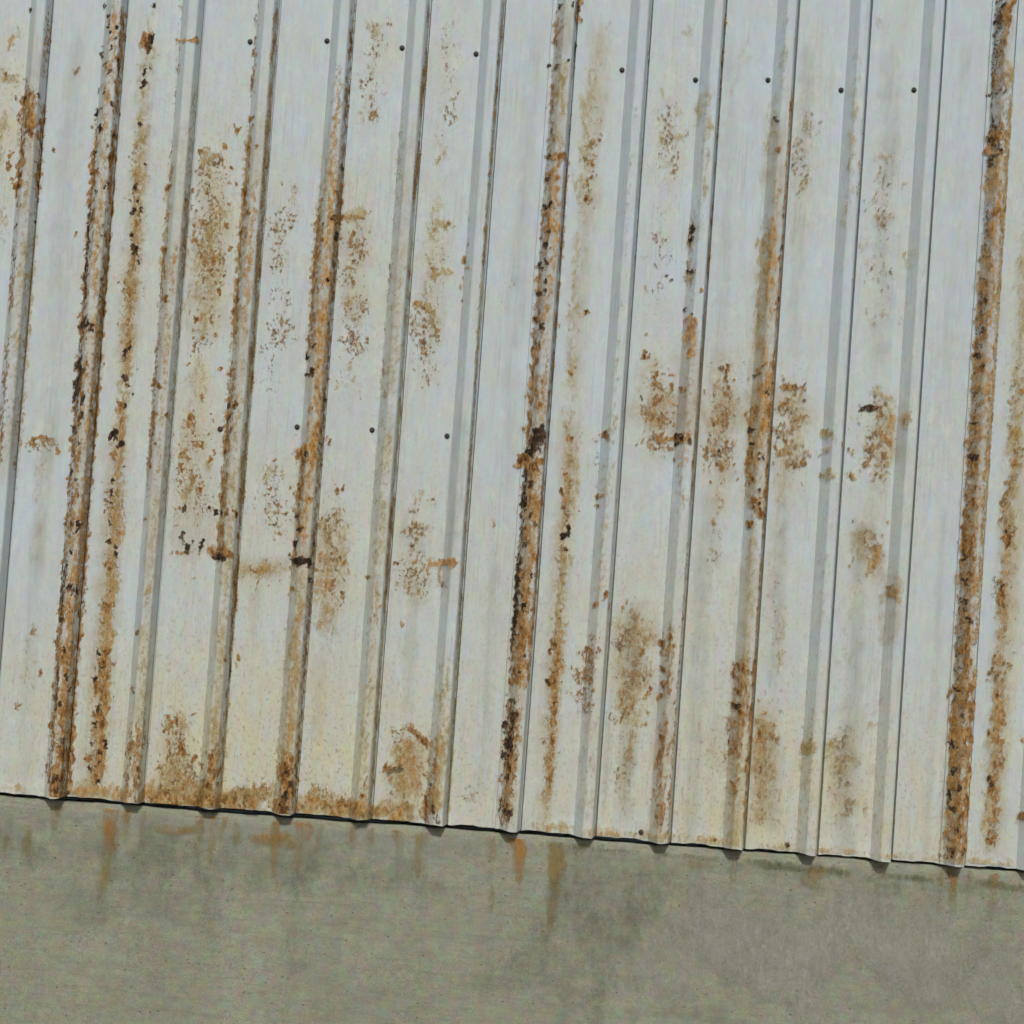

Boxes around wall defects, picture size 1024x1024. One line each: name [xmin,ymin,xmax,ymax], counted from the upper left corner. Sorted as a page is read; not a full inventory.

corrosion [0,1,474,862]
corrosion [474,282,484,403]
corrosion [482,2,505,267]
corrosion [498,0,603,826]
corrosion [541,417,690,842]
corrosion [635,89,911,844]
corrosion [938,0,1024,898]